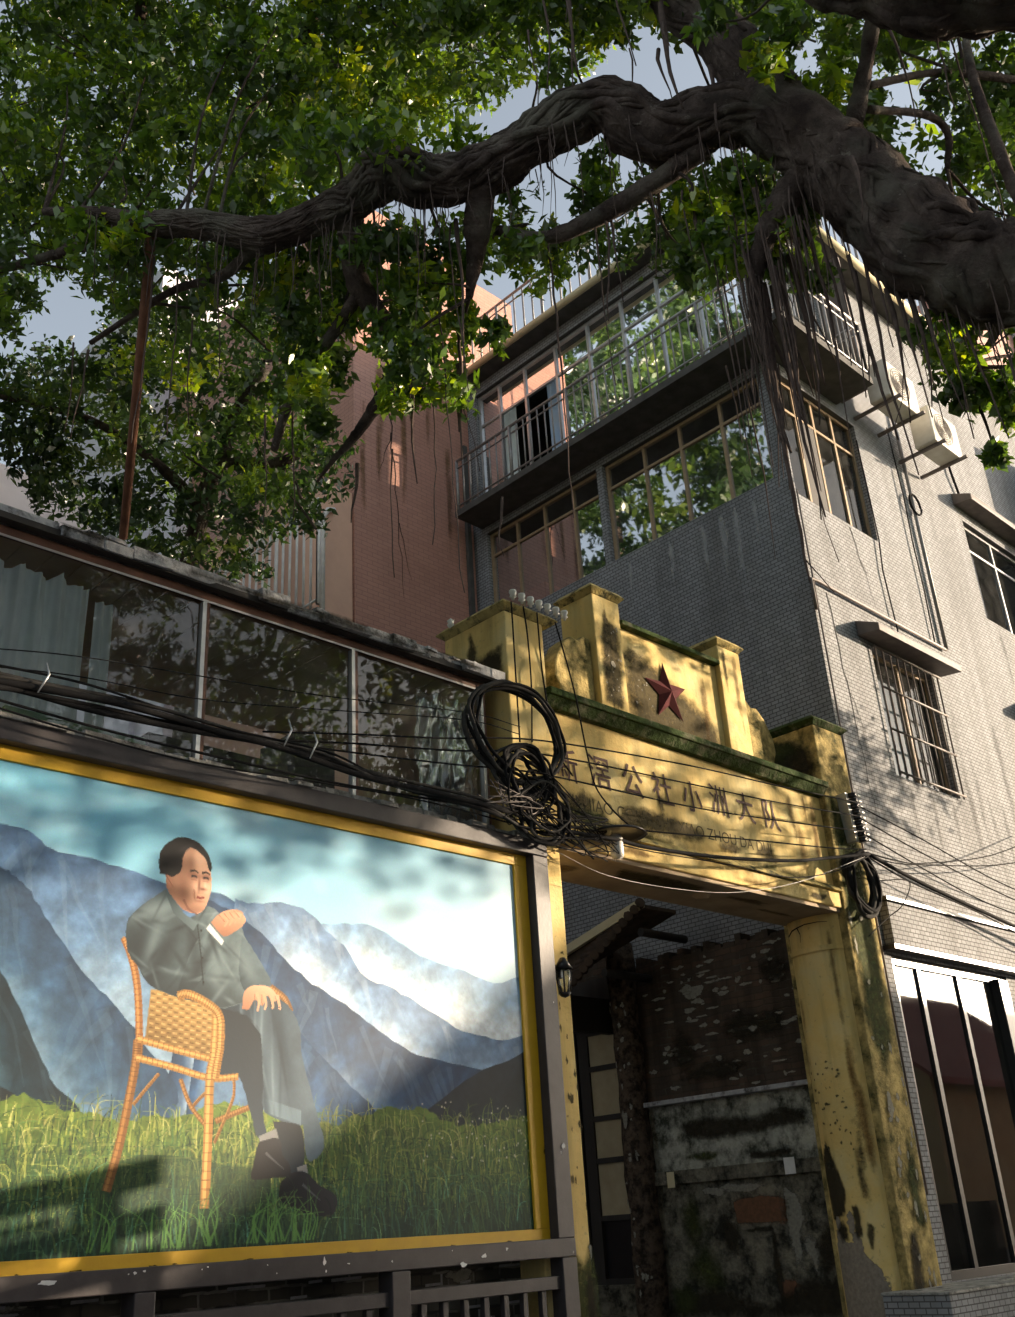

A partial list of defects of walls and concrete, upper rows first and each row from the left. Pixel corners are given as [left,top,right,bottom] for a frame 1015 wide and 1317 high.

damp [601,610,721,744]
damp [702,1183,761,1196]
damp [673,1187,843,1317]
flaking render [642,937,892,1317]